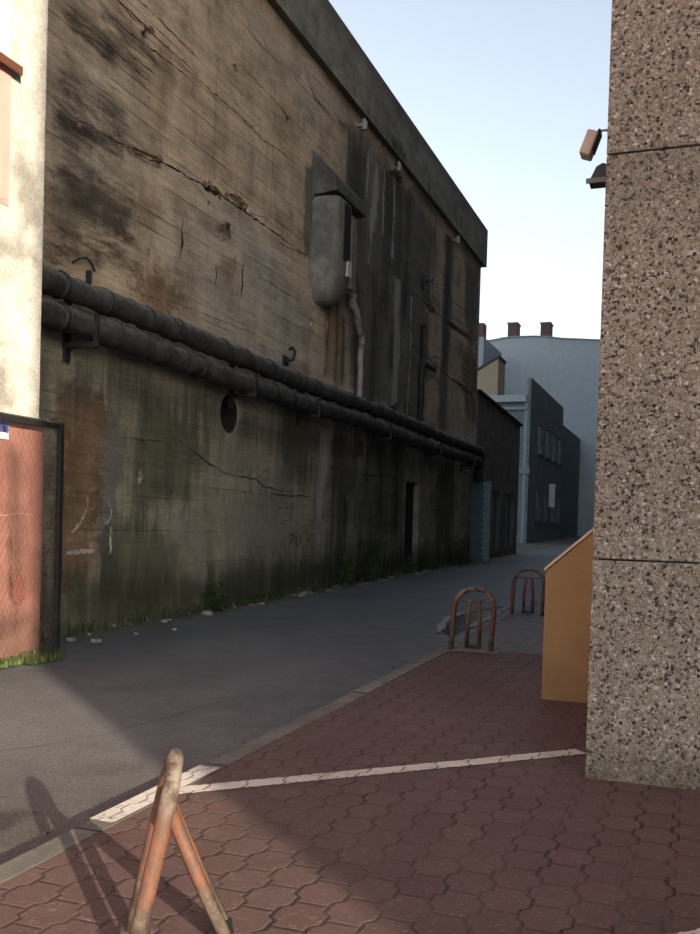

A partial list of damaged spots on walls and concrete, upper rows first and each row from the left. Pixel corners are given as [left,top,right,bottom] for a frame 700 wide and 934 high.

crack [79,0,350,185]
crack [69,114,310,259]
water stain [347,131,453,430]
water stain [464,260,480,336]
crack [123,437,314,503]
water stain [315,429,337,552]